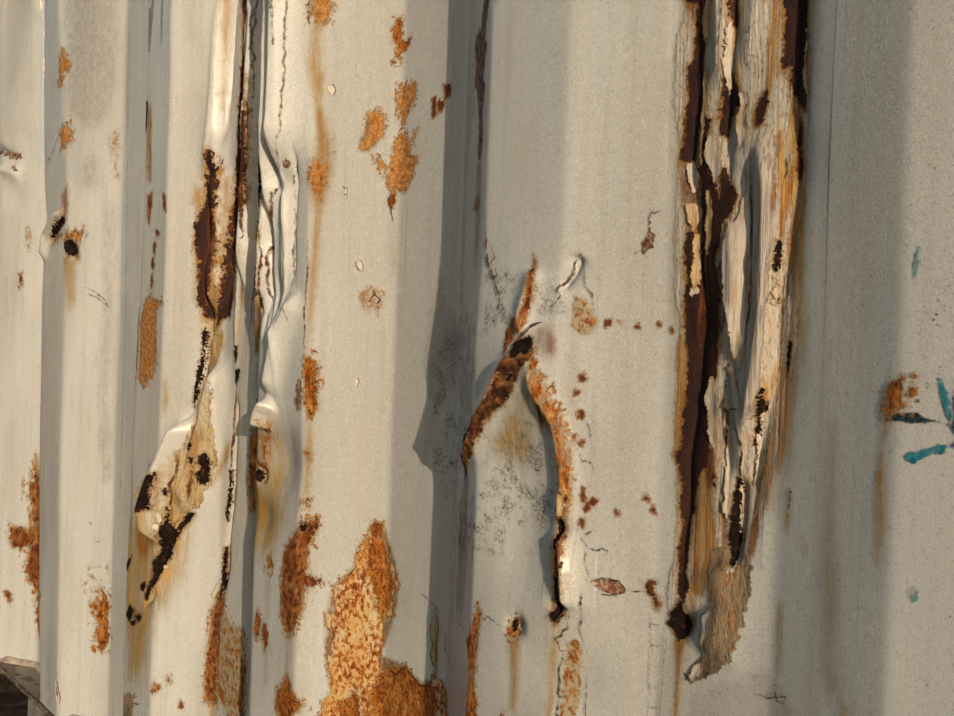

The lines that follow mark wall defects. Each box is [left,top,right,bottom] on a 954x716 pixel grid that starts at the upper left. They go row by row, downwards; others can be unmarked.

corrosion [357,16,420,221]
corrosion [134,192,169,395]
corrosion [294,348,325,421]
corrosion [502,259,537,355]
corrosion [525,336,599,529]
peeling [666,0,809,684]
corrosion [878,371,929,425]
corrosion [4,454,41,638]
corrosion [198,593,269,716]
corrosion [245,419,448,716]
corrosion [465,601,483,716]
corrosion [560,639,582,716]